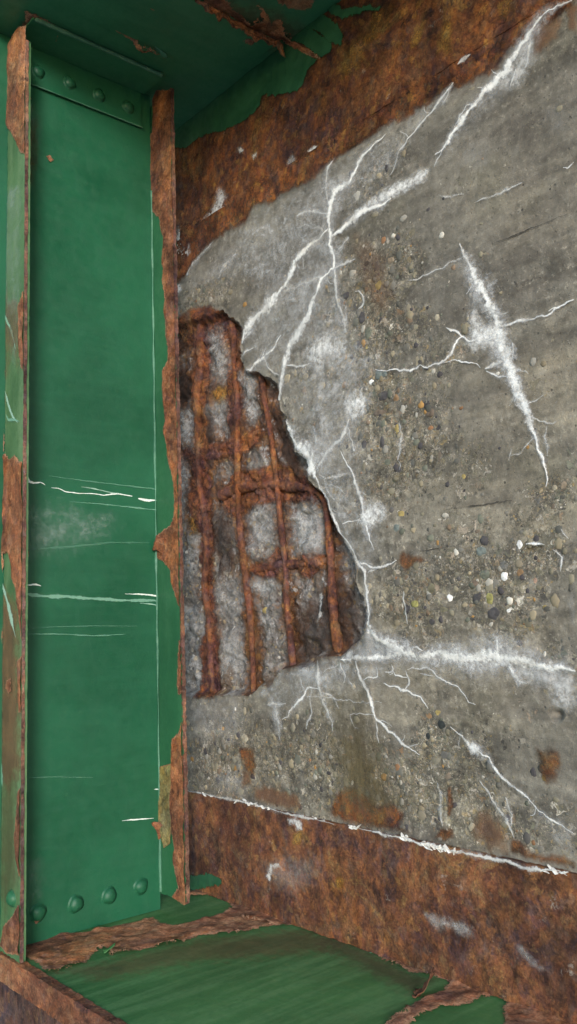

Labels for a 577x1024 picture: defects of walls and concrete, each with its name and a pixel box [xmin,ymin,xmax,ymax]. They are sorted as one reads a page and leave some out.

rust [150,0,576,698]
crack [242,0,575,755]
spalling [178,150,577,831]
rust [1,435,29,876]
rust [152,725,206,905]
rust [332,790,403,828]
rust [438,829,453,840]
water stain [348,824,568,876]
crack [451,727,573,833]
rust [475,814,575,866]
rust [537,749,560,782]
rust [378,955,490,1024]